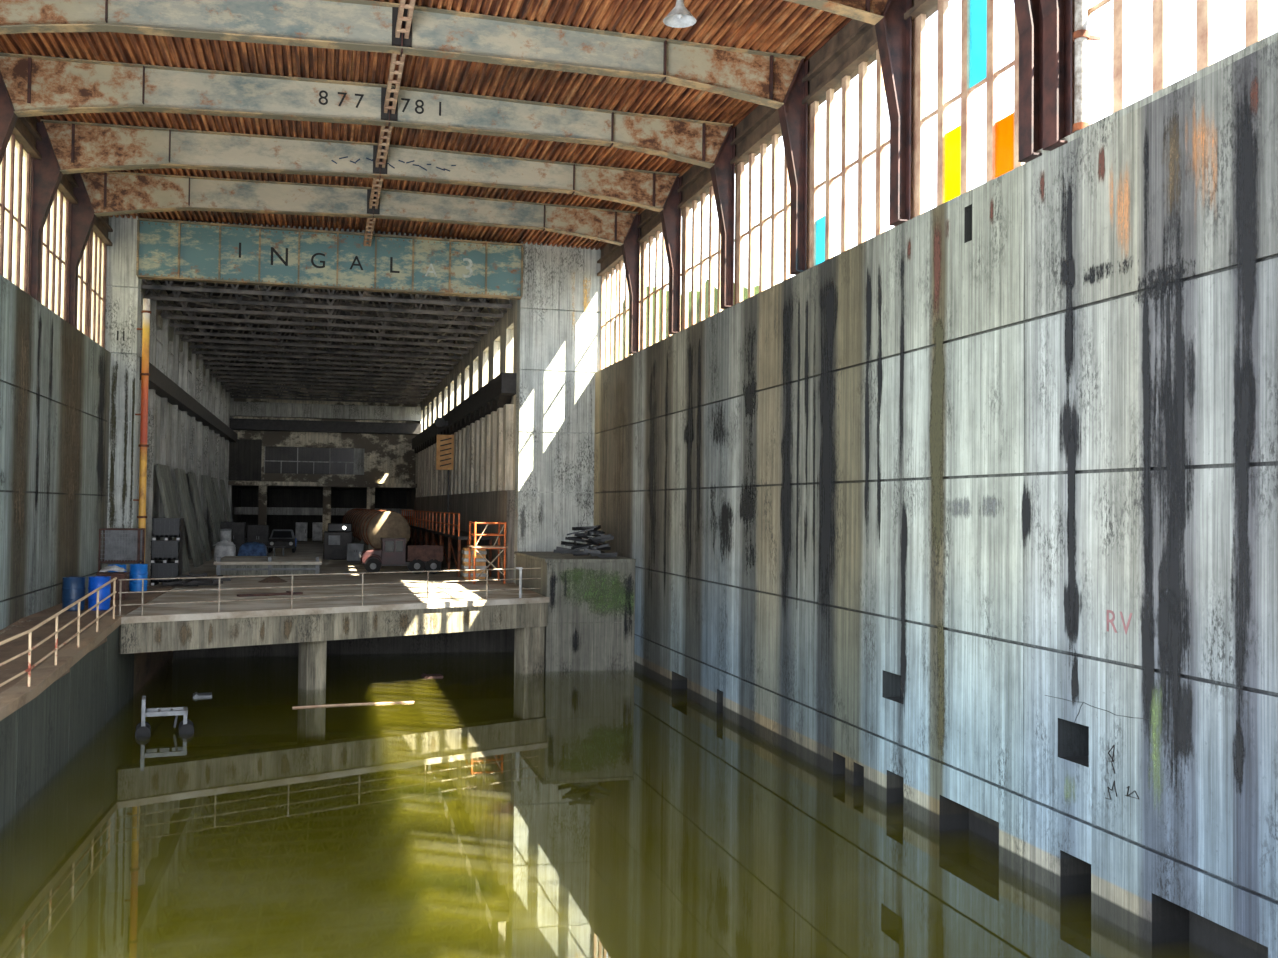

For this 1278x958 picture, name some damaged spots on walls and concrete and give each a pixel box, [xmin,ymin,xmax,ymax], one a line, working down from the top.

water stain [0,305,82,550]
water stain [97,358,135,528]
water stain [780,282,838,660]
water stain [1060,116,1195,786]
water stain [1229,87,1259,792]